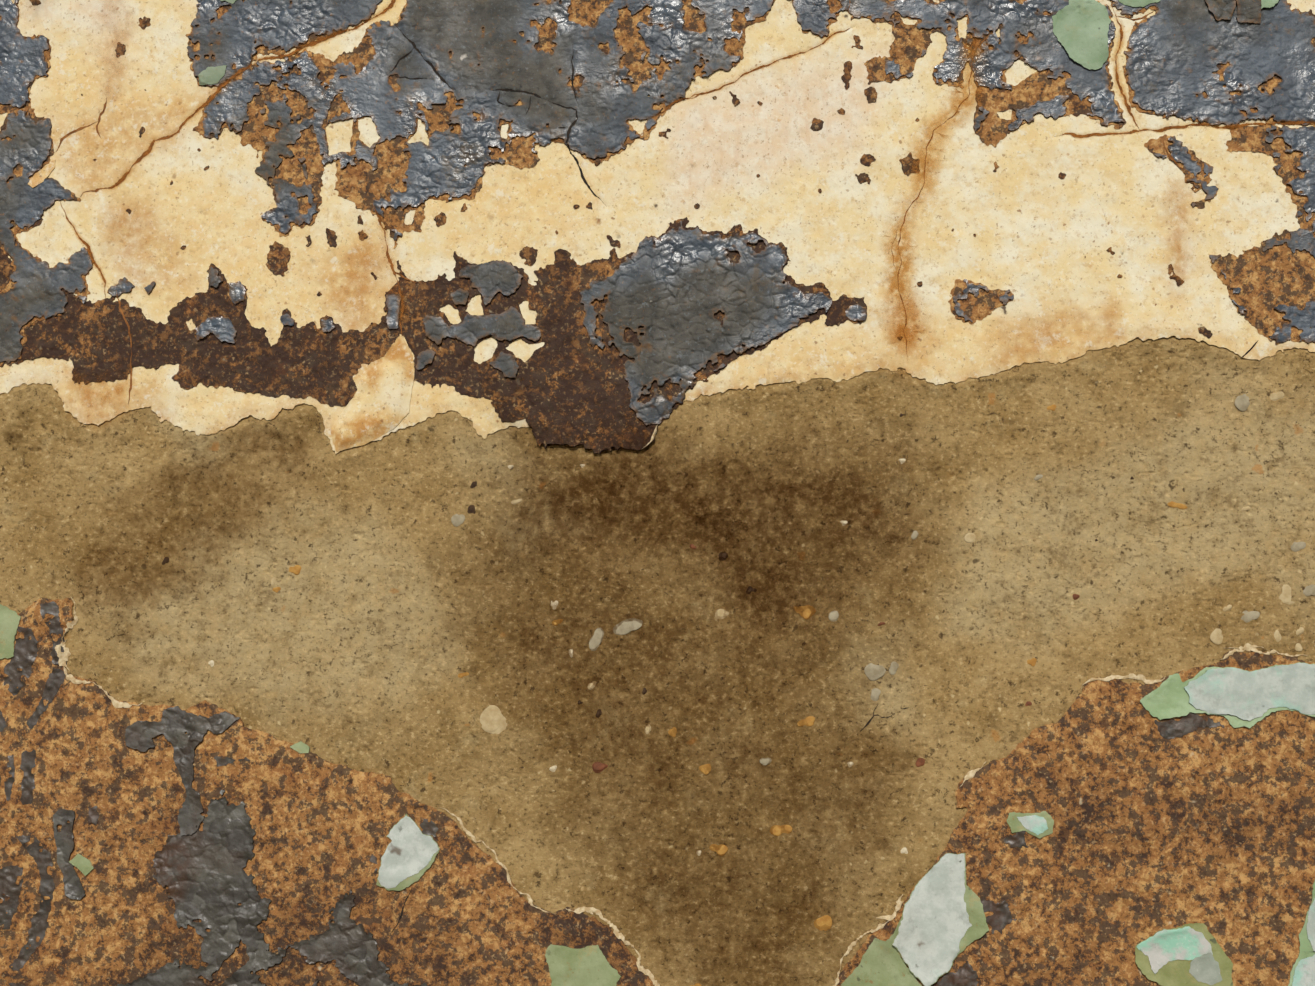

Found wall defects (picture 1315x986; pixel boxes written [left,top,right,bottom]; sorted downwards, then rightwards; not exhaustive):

peeling [0,0,93,366]
crack [54,0,452,403]
corrosion [0,217,867,454]
peeling [186,0,775,248]
crack [495,38,602,201]
crack [652,1,852,118]
crack [892,34,990,361]
peeling [791,0,1315,345]
crack [1059,7,1315,171]
spalling [0,221,1315,986]
corrosion [0,598,655,986]
corrosion [836,650,1315,986]